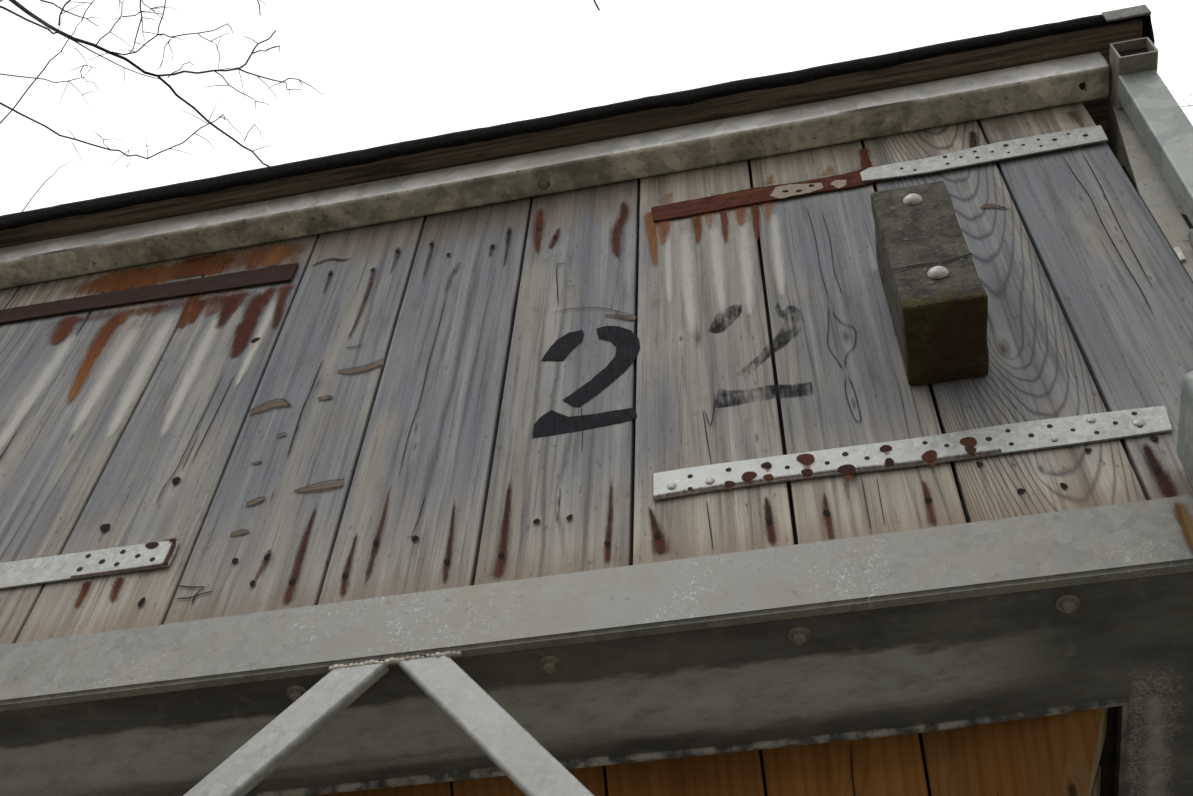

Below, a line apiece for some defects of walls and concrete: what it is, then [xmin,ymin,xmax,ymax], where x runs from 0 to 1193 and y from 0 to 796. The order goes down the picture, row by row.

rust [859,148,871,169]
rust [693,202,770,243]
rust [51,316,80,344]
rust [69,285,292,403]
rust [284,509,316,603]
rust [341,534,357,595]
rust [366,492,389,578]
rust [443,503,455,581]
rust [493,484,511,576]
rust [604,483,612,561]
rust [649,437,1002,553]
rust [1143,444,1193,550]